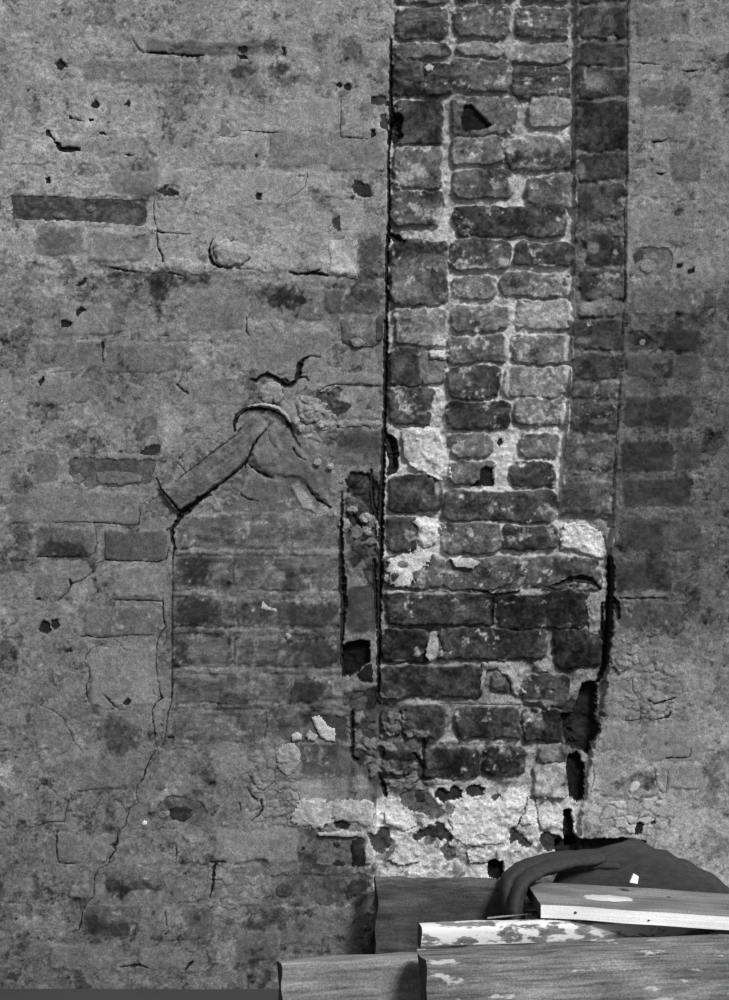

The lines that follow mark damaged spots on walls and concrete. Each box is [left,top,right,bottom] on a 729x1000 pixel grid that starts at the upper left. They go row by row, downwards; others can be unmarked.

spalling [461,104,490,132]
spalling [350,180,373,199]
crack [249,38,404,761]
spalling [338,472,386,551]
peeling [451,558,481,569]
crack [469,589,519,624]
peeling [426,631,444,661]
crack [552,556,676,724]
crack [36,407,306,934]
crack [412,738,426,784]
crack [379,776,388,797]
peeling [270,784,562,909]